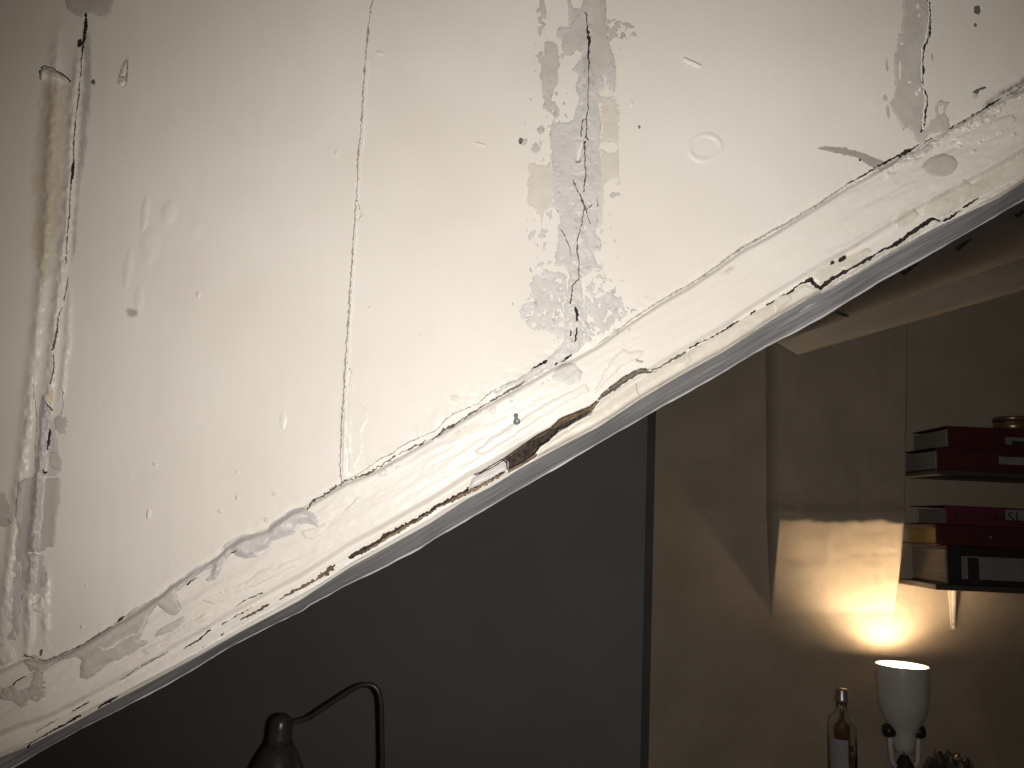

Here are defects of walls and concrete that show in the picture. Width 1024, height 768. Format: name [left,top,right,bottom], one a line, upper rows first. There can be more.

crack [32,13,88,474]
crack [0,198,987,757]
peeling [474,381,590,456]
peeling [518,91,568,166]
crack [307,0,1024,510]
peeling [537,152,1024,457]